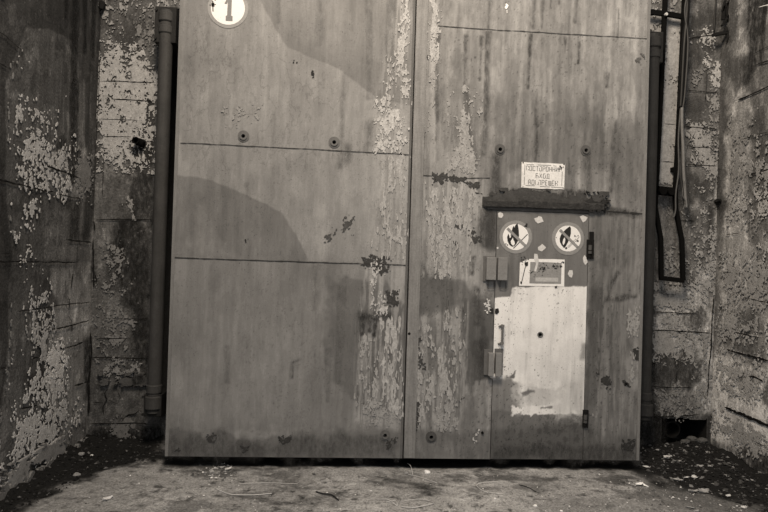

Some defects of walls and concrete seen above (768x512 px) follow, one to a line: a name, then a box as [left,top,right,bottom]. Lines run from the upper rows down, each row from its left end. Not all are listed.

peeling [0,0,180,501]
peeling [650,0,768,462]